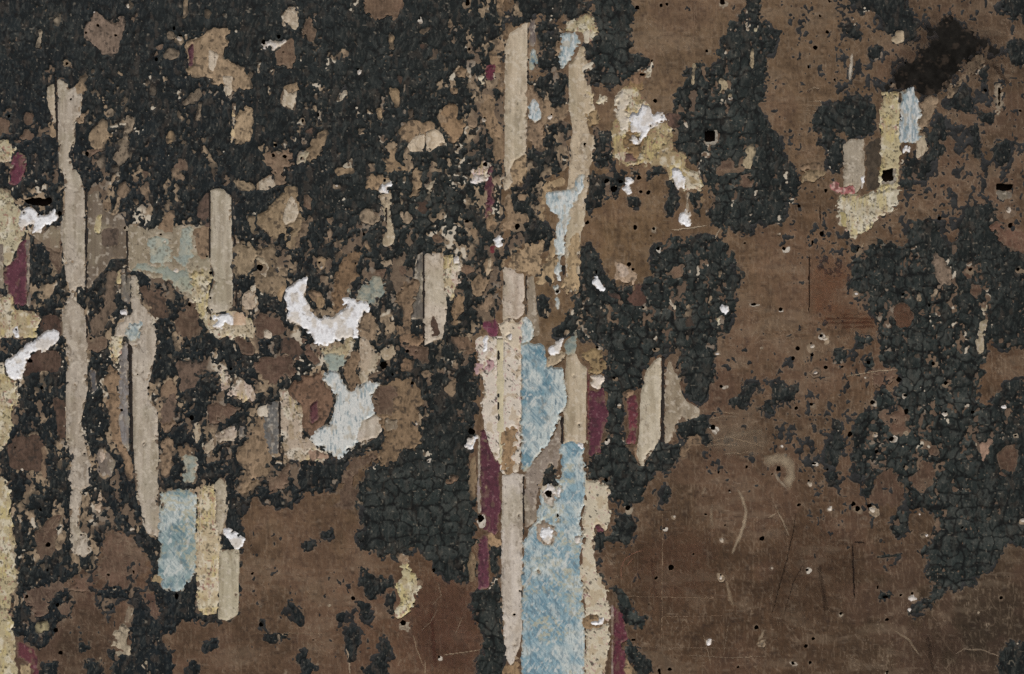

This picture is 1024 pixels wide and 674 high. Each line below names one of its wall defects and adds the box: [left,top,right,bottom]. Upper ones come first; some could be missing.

peeling [156,9,260,121]
peeling [47,84,56,138]
peeling [432,0,595,319]
peeling [583,81,651,169]
peeling [623,166,705,217]
spalling [881,168,893,182]
peeling [893,253,988,354]
peeling [0,106,350,651]
peeling [590,375,616,389]
peeling [677,414,715,444]
peeling [593,505,637,551]
peeling [583,573,622,674]